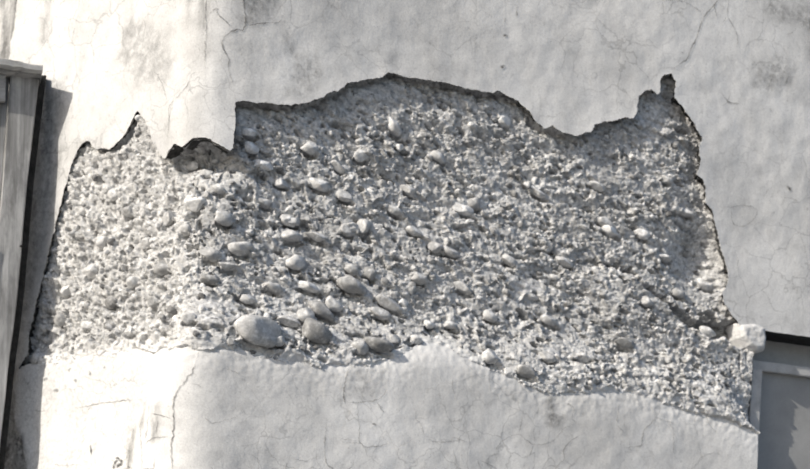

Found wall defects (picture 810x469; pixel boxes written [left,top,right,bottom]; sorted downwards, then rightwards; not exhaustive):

flaking render [0,0,17,59]
spalling [19,72,760,435]